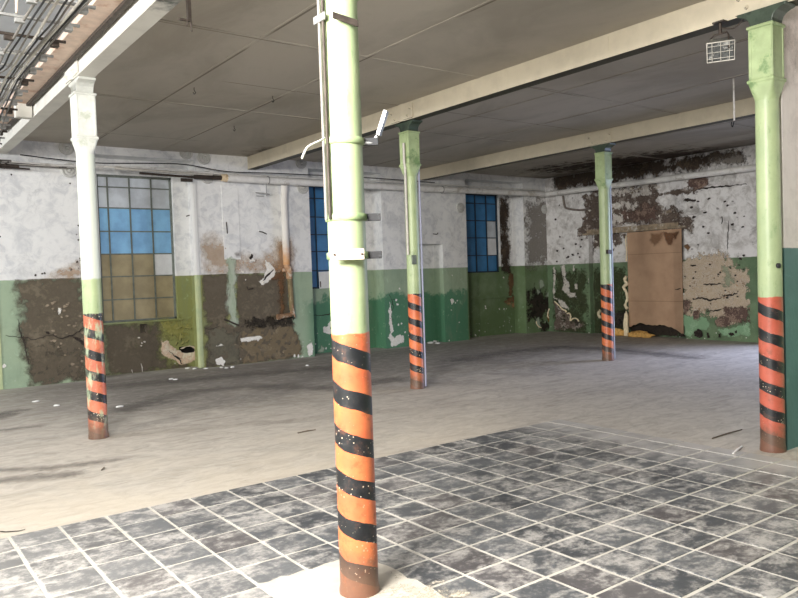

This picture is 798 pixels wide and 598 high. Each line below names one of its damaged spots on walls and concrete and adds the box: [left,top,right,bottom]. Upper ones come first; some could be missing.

water stain [524,197,547,270]
water stain [524,157,600,251]
water stain [609,147,751,254]
rust [271,245,291,314]
water stain [526,267,602,333]
spalling [547,239,585,331]
water stain [613,266,680,337]
flaking render [680,244,751,339]
spalling [161,326,234,369]